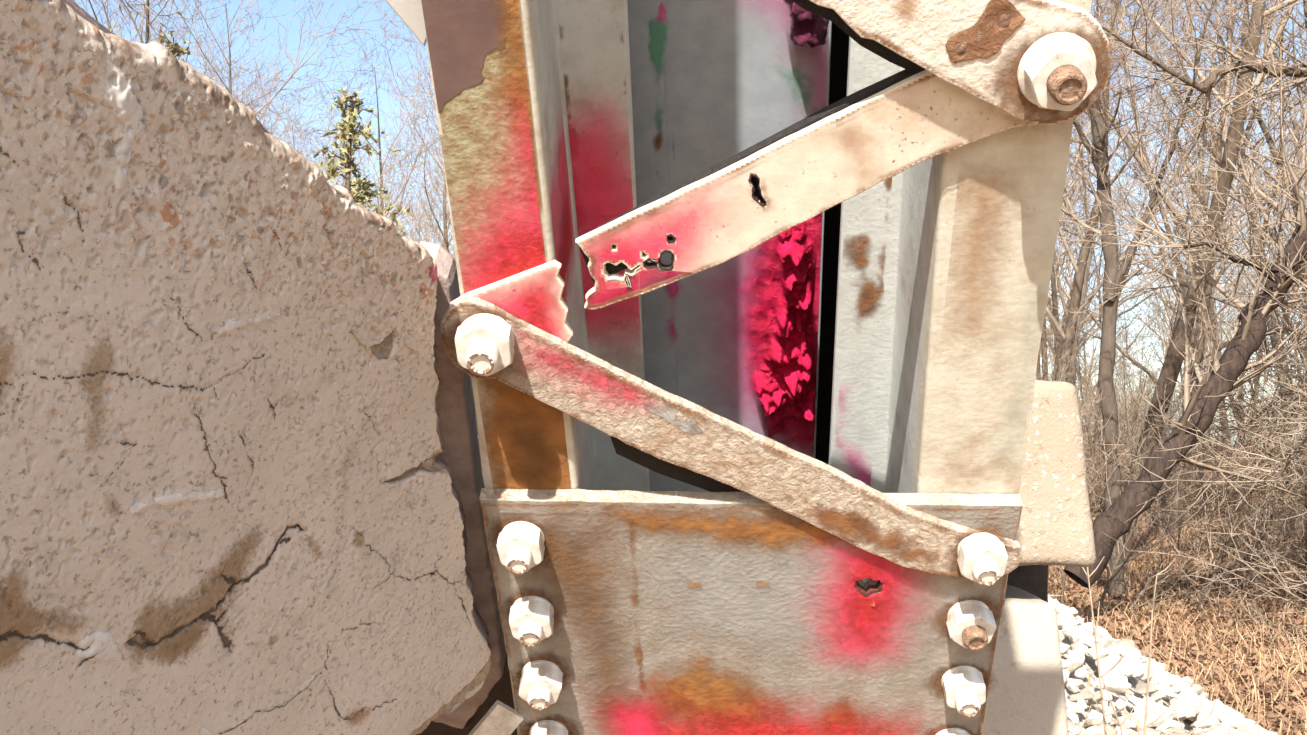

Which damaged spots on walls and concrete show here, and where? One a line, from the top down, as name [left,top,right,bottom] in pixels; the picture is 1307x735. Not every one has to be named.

rust [502,0,541,208]
rust [857,28,937,86]
rust [959,12,1112,124]
rust [846,235,884,316]
rust [441,304,706,421]
crack [0,354,265,503]
crack [0,630,97,667]
leakage [0,534,256,666]
crack [128,525,305,653]
crack [219,623,397,734]
crack [351,527,472,626]
rust [621,475,1022,577]